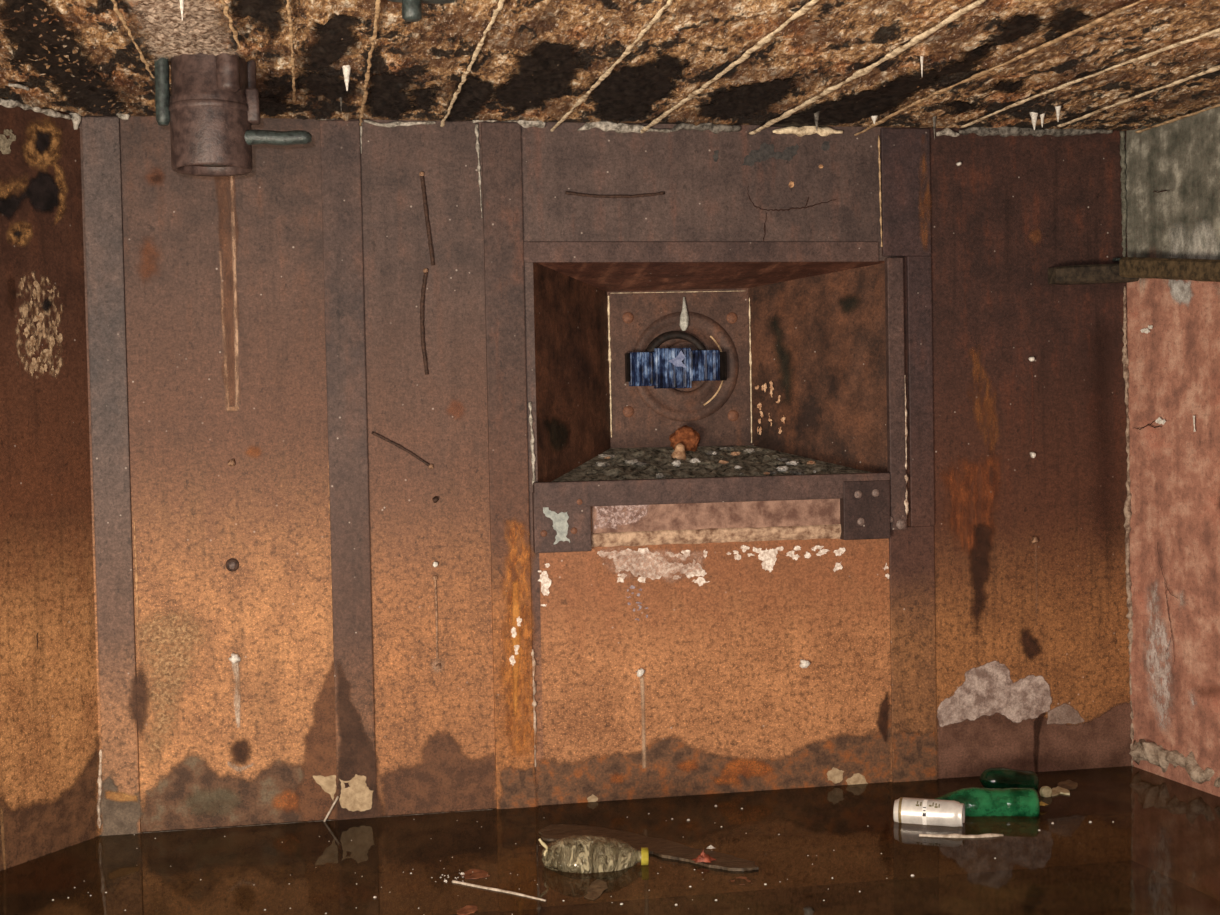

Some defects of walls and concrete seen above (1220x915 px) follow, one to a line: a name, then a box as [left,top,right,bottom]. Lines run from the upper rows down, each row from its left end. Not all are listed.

damp [0,0,130,130]
damp [131,0,286,58]
damp [296,14,579,128]
damp [577,6,1090,137]
damp [936,126,1113,138]
damp [0,172,60,244]
rust [502,522,534,754]
peeling [597,548,710,621]
peeling [726,545,846,573]
rust [945,459,996,630]
peeling [936,661,1084,727]
damp [0,664,1132,871]